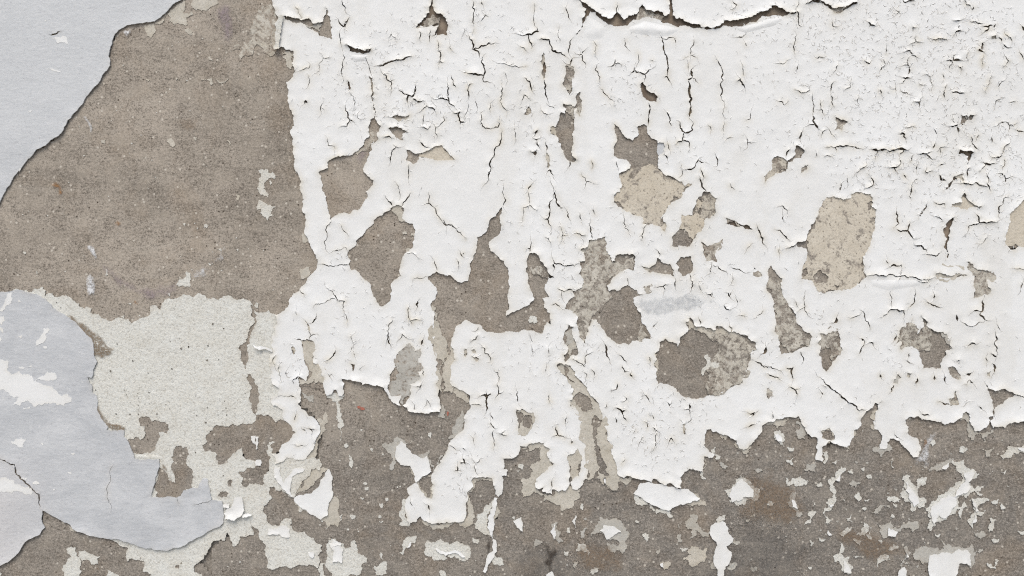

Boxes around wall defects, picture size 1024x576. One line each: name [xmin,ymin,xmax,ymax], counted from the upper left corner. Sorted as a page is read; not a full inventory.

peeling [0,0,332,369]
peeling [614,124,692,231]
crack [272,0,1024,517]
peeling [793,192,876,293]
peeling [0,477,40,495]
peeling [0,359,72,409]
peeling [116,392,170,454]
peeling [154,446,196,498]
peeling [194,200,1024,576]
peeling [0,511,151,576]